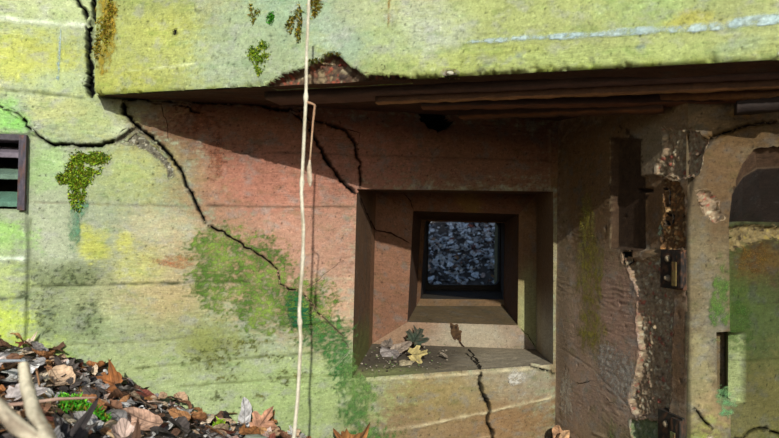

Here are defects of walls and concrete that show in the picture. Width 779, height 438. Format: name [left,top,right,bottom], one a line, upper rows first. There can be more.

crack [73,0,97,98]
spalling [265,51,415,87]
crack [0,97,409,369]
spalling [620,124,709,438]
spalling [694,188,779,252]
leakage [190,340,283,380]
crack [459,341,496,438]
crack [691,406,779,438]